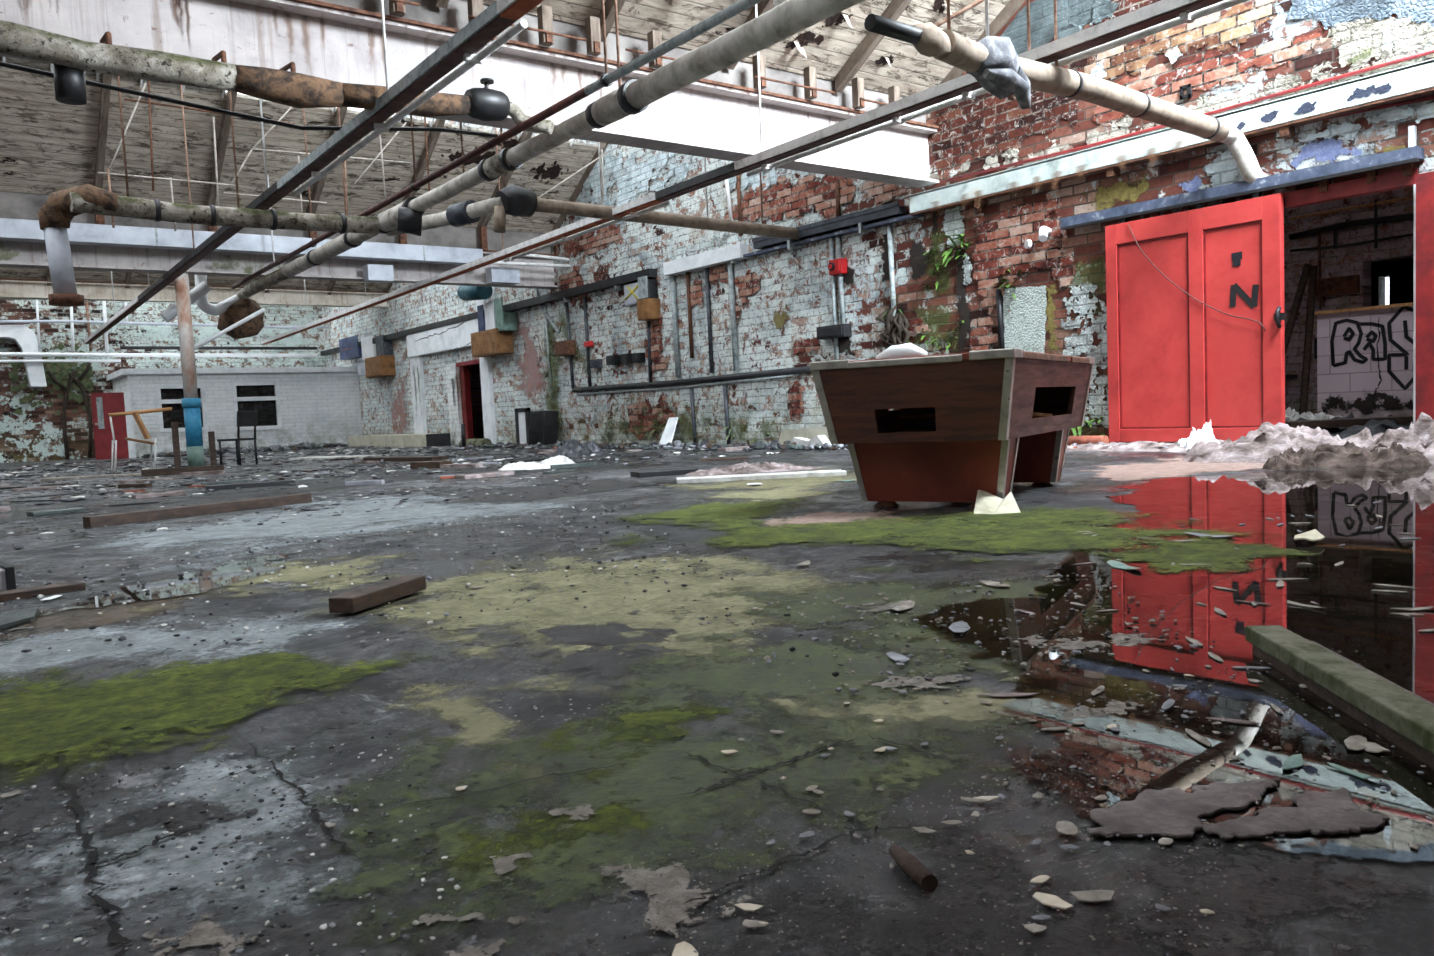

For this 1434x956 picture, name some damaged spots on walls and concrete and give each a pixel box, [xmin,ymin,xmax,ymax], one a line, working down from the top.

spalling [927,90,1169,185]
peeling [1000,0,1161,55]
spalling [1062,0,1434,143]
peeling [559,150,689,307]
spalling [669,167,907,321]
peeling [0,392,81,463]
damp [0,451,856,798]
crack [0,754,196,956]
damp [18,746,362,956]
crack [217,741,356,853]
peeling [1056,754,1390,842]
flaking render [1344,735,1390,753]